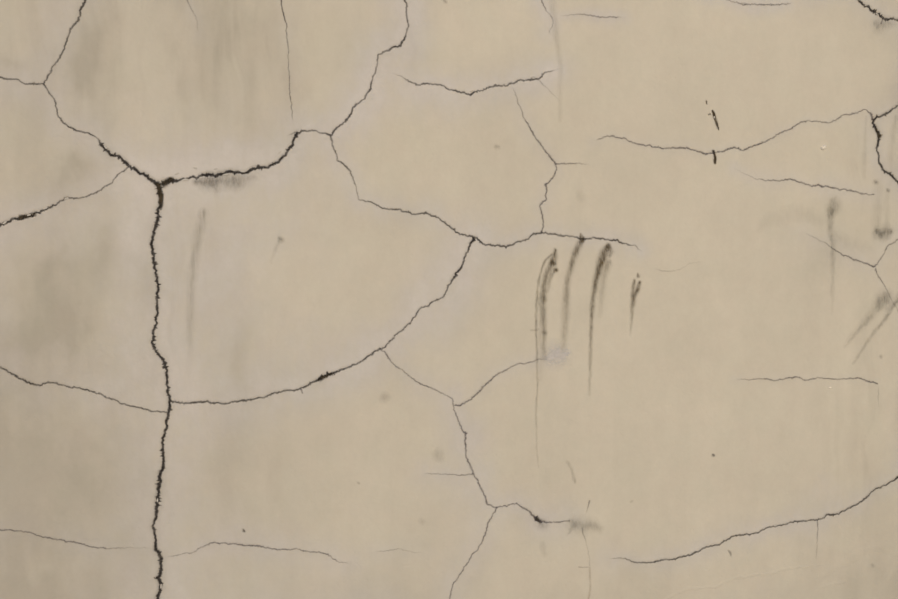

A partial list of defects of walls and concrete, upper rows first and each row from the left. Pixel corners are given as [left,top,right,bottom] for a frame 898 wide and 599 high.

crack [0,0,86,86]
crack [858,0,898,21]
crack [411,76,542,96]
crack [844,106,898,183]
water stain [594,244,609,289]
crack [0,83,623,599]
crack [631,476,898,563]